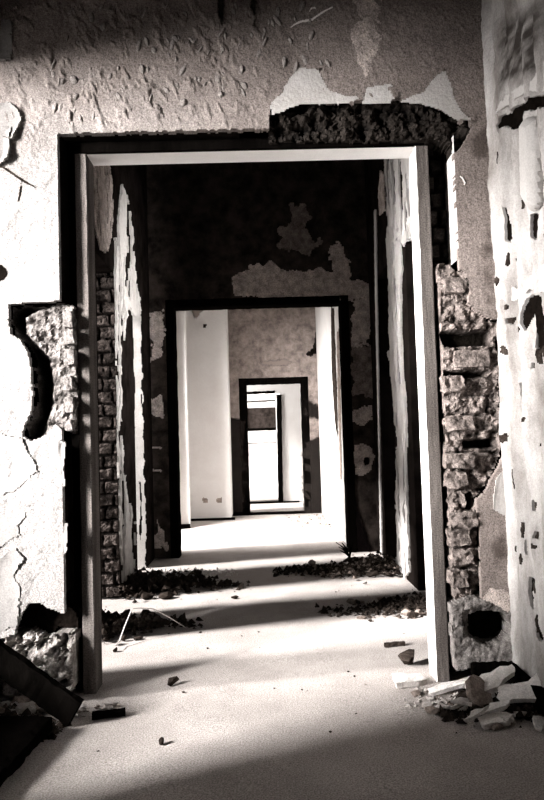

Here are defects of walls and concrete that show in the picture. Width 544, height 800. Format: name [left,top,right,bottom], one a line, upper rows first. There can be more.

peeling [0,18,12,62]
peeling [0,101,22,166]
flaking render [268,67,475,163]
peeling [495,61,544,114]
peeling [494,264,544,332]
flaking render [93,165,169,597]
peeling [232,158,412,579]
flaking render [534,346,544,368]
flaking render [0,303,81,691]
flaking render [433,263,515,671]
flaking render [515,522,539,565]